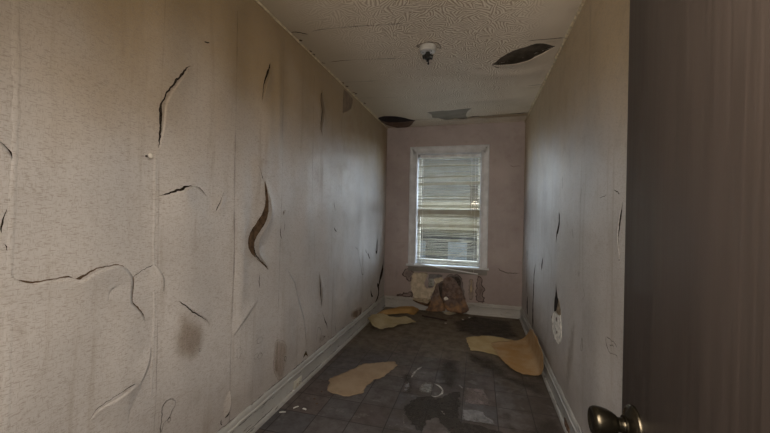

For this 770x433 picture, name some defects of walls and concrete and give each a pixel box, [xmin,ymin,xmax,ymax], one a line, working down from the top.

flaking render [410,272,443,299]